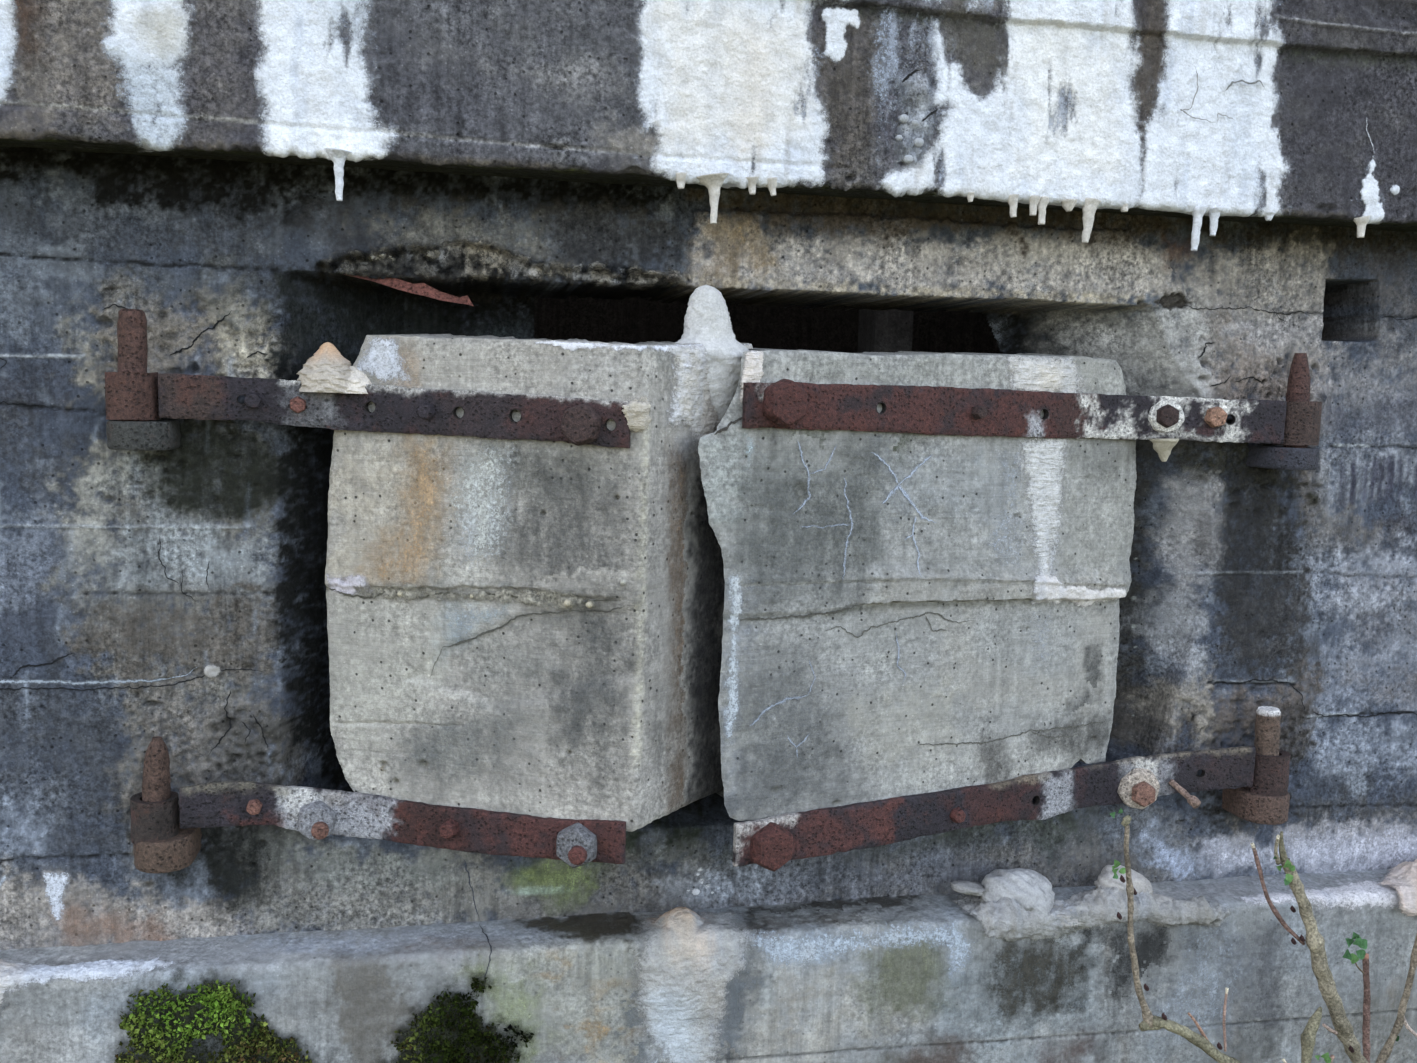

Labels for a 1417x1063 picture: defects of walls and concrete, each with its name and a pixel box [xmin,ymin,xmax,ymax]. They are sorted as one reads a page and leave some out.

leakage [0,0,31,101]
leakage [102,0,195,152]
leakage [254,0,396,201]
leakage [637,0,829,224]
leakage [872,11,901,113]
leakage [882,0,1290,251]
leakage [1351,120,1400,238]
spalling [326,240,686,292]
crack [325,586,624,677]
crack [750,661,816,726]
crack [742,442,973,681]
leakage [715,895,918,1063]